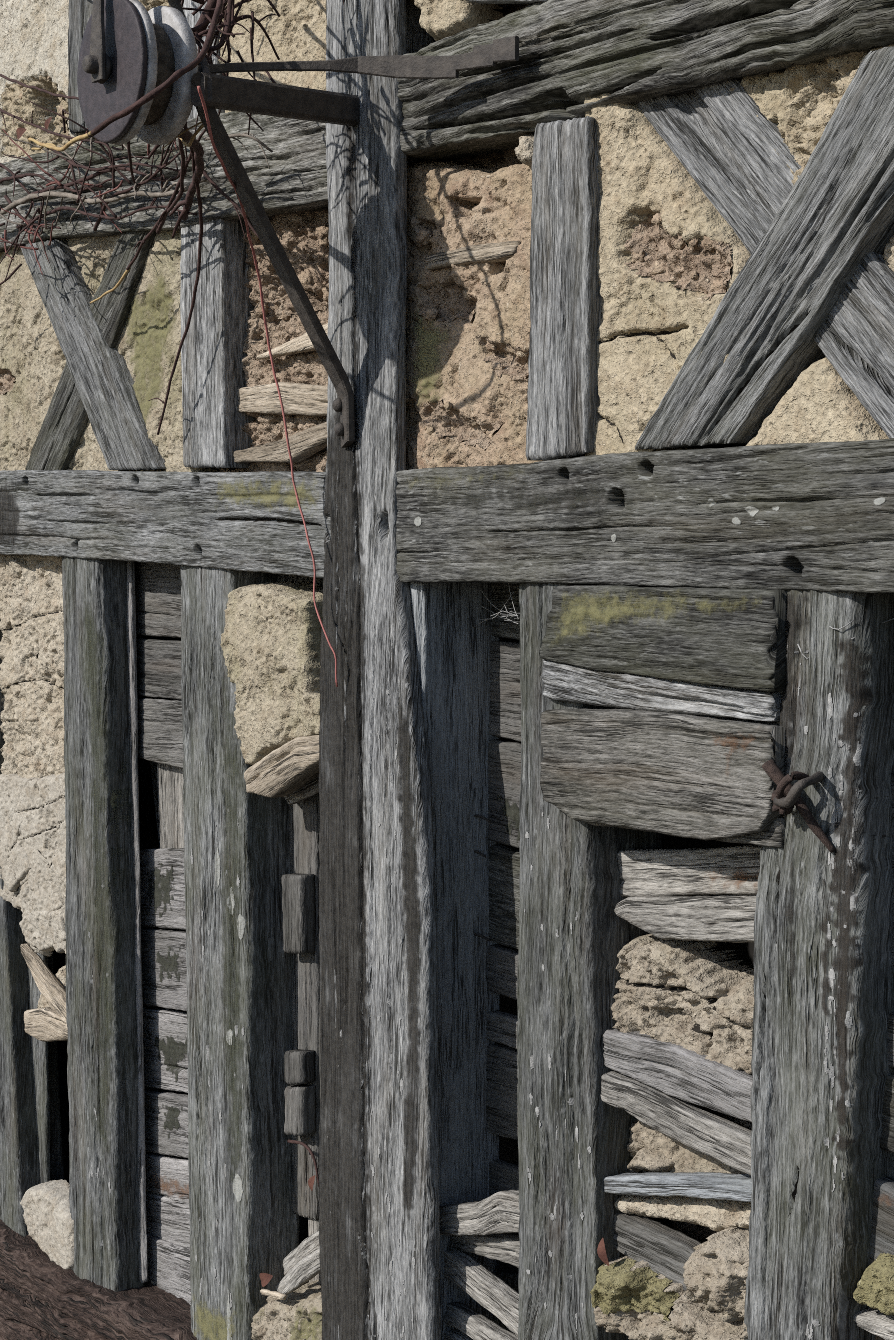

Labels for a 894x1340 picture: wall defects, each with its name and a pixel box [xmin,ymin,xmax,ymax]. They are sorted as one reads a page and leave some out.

spalling [623,213,733,300]
crack [599,328,688,359]